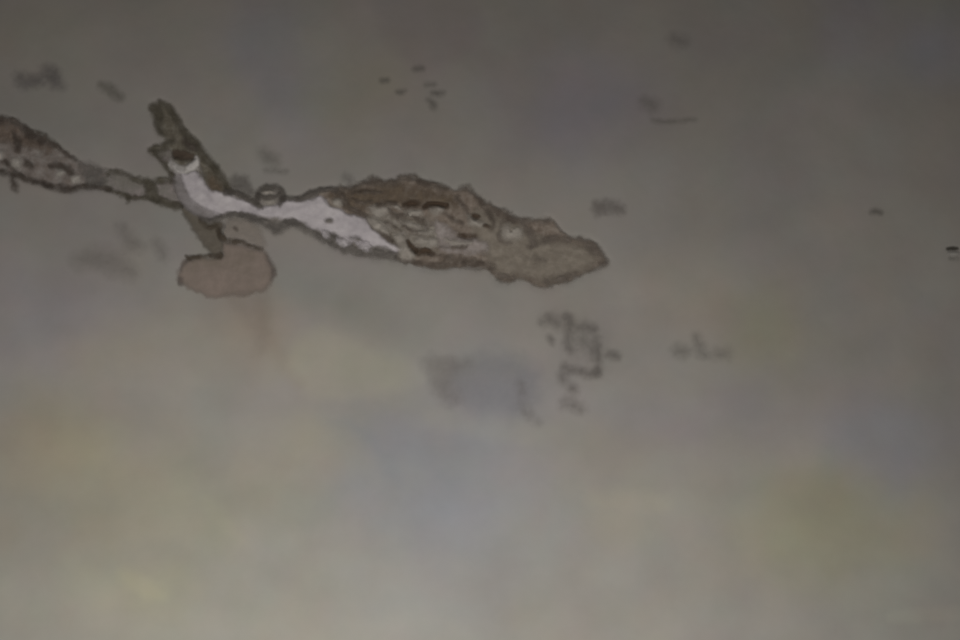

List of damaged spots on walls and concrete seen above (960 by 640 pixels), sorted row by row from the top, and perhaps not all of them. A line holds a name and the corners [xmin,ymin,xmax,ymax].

flaking render [0,116,110,193]
flaking render [149,101,607,287]